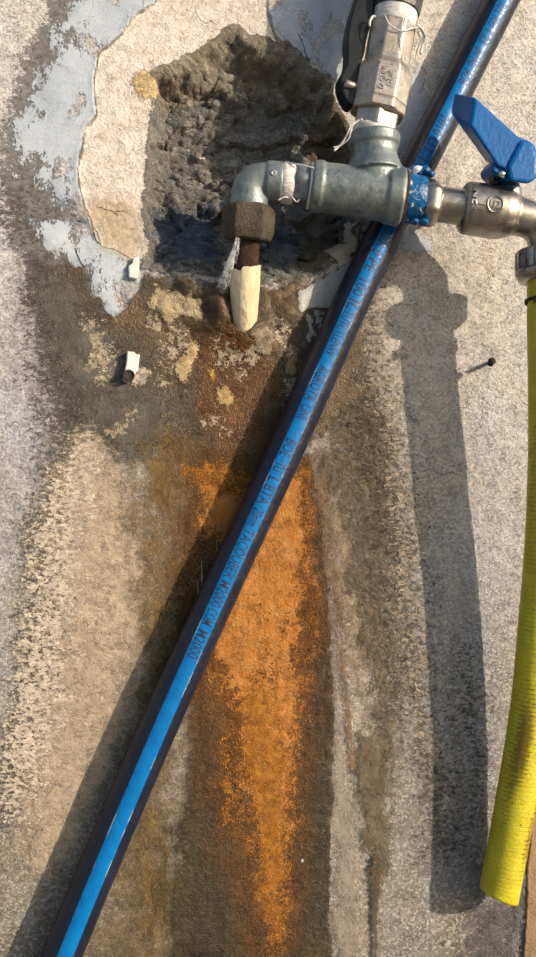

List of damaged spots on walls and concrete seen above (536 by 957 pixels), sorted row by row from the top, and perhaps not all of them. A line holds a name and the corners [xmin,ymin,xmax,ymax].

damp [0,0,328,890]
spalling [4,0,353,323]
rust [173,458,252,619]
spalling [251,326,276,355]
spalling [258,204,365,346]
rust [194,462,328,957]